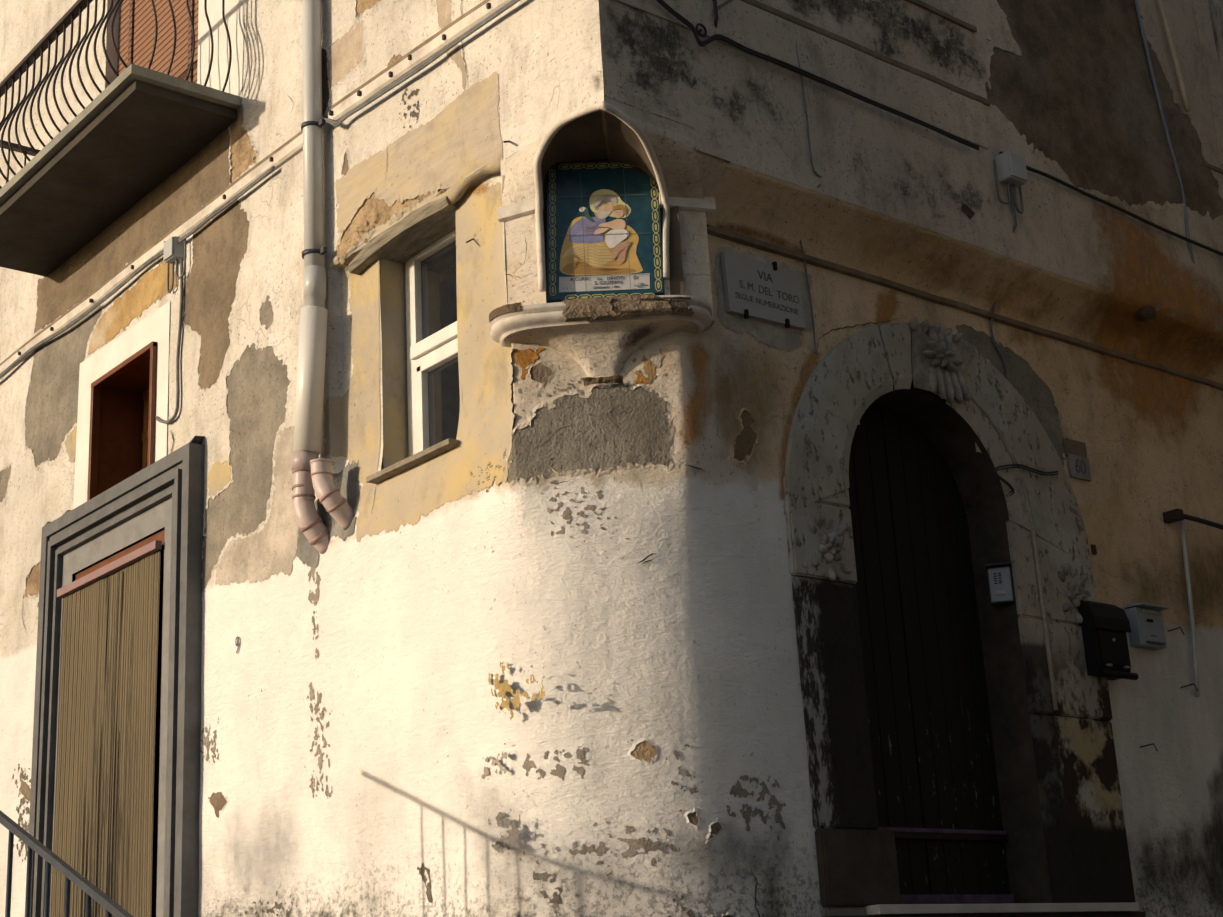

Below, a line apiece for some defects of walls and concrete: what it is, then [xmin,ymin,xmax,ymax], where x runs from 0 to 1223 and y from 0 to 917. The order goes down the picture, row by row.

leakage [613,6,696,102]
leakage [789,0,984,79]
peeling [331,42,503,279]
flaking render [979,0,1223,229]
flaking render [0,97,261,510]
peeling [182,196,299,608]
spalling [470,340,676,548]
peeling [308,567,322,665]
peeling [306,681,332,799]
peeling [522,743,596,789]
peeling [628,738,786,844]
peeling [488,809,680,904]